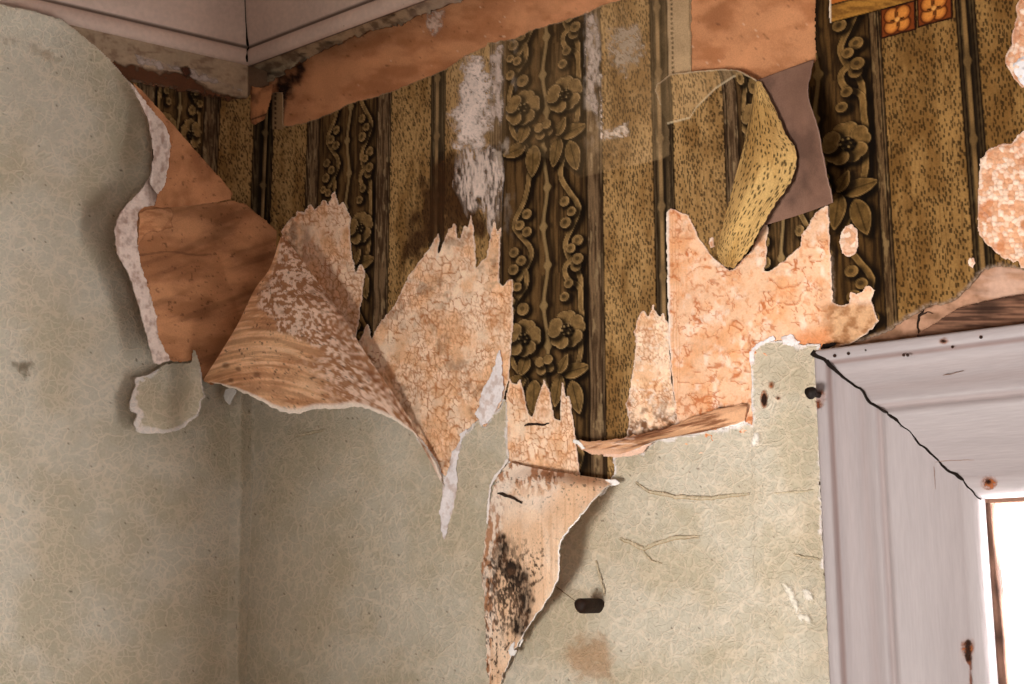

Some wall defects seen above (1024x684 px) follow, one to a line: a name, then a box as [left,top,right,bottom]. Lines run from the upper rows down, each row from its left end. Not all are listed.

damp [490,46,503,121]
corrosion [760,382,779,408]
crack [810,350,981,500]
mould [482,534,544,680]
corrosion [962,640,973,684]